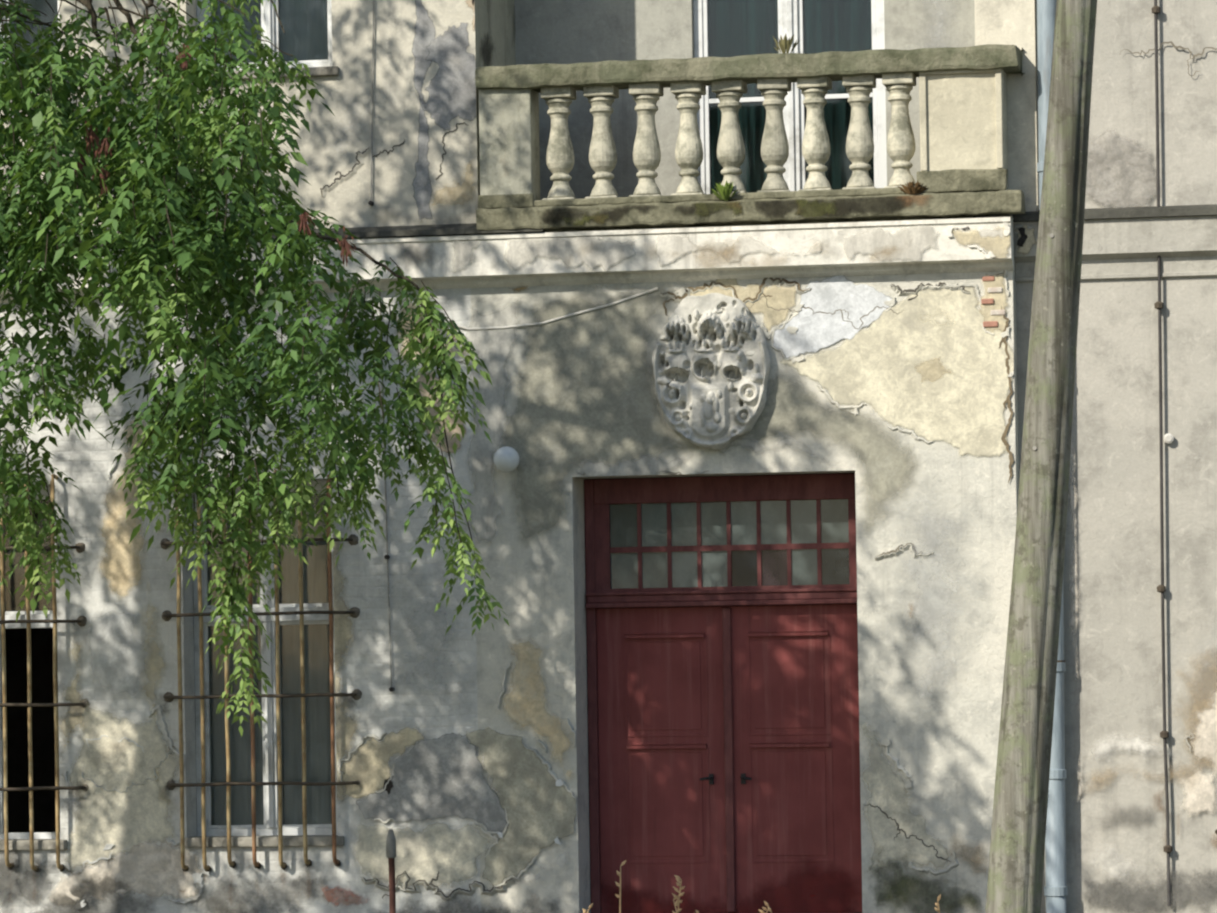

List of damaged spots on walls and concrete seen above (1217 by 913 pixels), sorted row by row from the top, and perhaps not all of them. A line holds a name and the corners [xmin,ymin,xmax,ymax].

crack [320,0,467,219]
crack [660,278,970,329]
spalling [674,245,1014,456]
crack [999,306,1014,483]
peeling [101,410,150,595]
crack [875,543,933,561]
spalling [338,728,423,798]
peeling [1182,692,1217,814]
damp [0,850,142,913]
damp [199,870,325,913]
spalling [355,808,509,892]
crack [863,803,952,862]